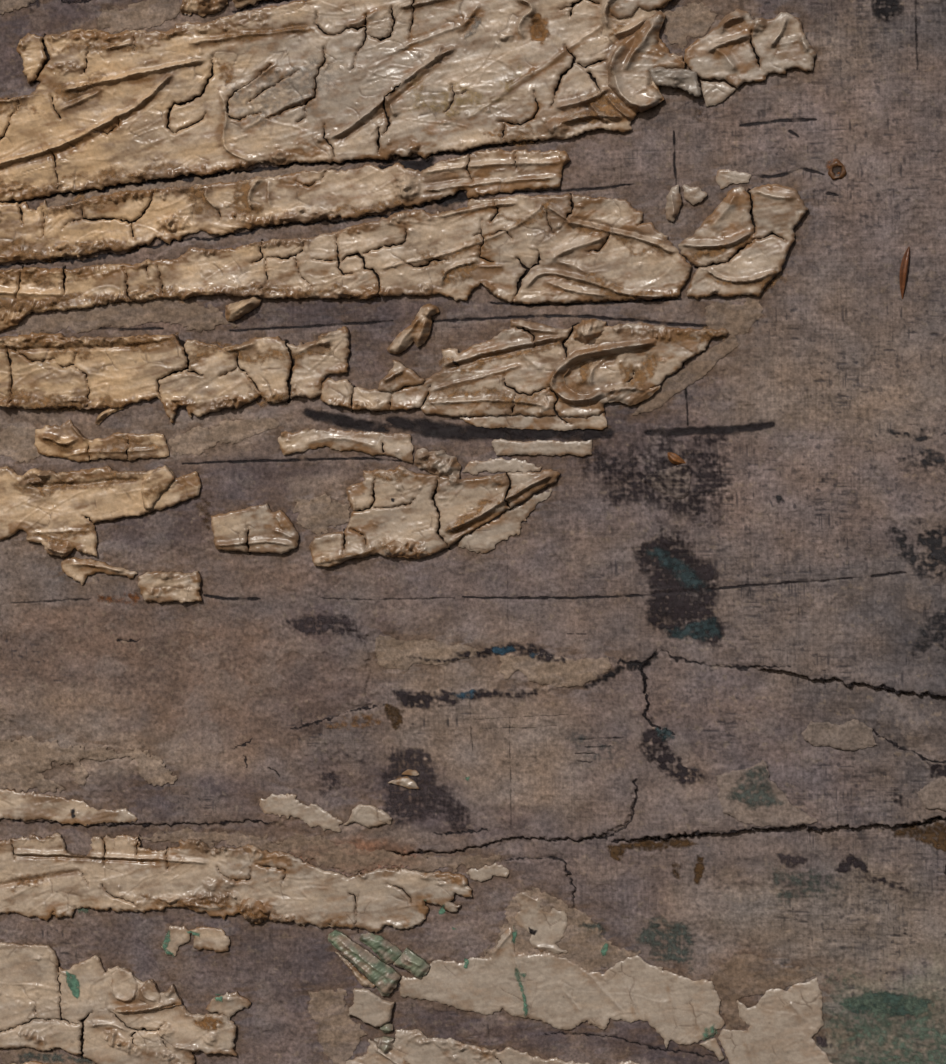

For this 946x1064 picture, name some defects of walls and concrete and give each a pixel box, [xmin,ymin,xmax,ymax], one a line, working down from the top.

peeling [0,0,816,604]
damp [888,429,945,468]
damp [635,532,725,645]
damp [916,612,946,649]
crack [617,651,791,735]
crack [820,678,946,697]
crack [872,729,946,763]
peeling [0,736,509,956]
crack [394,778,839,902]
crack [901,816,946,827]
peeling [0,941,252,1064]
peeling [346,892,833,1064]